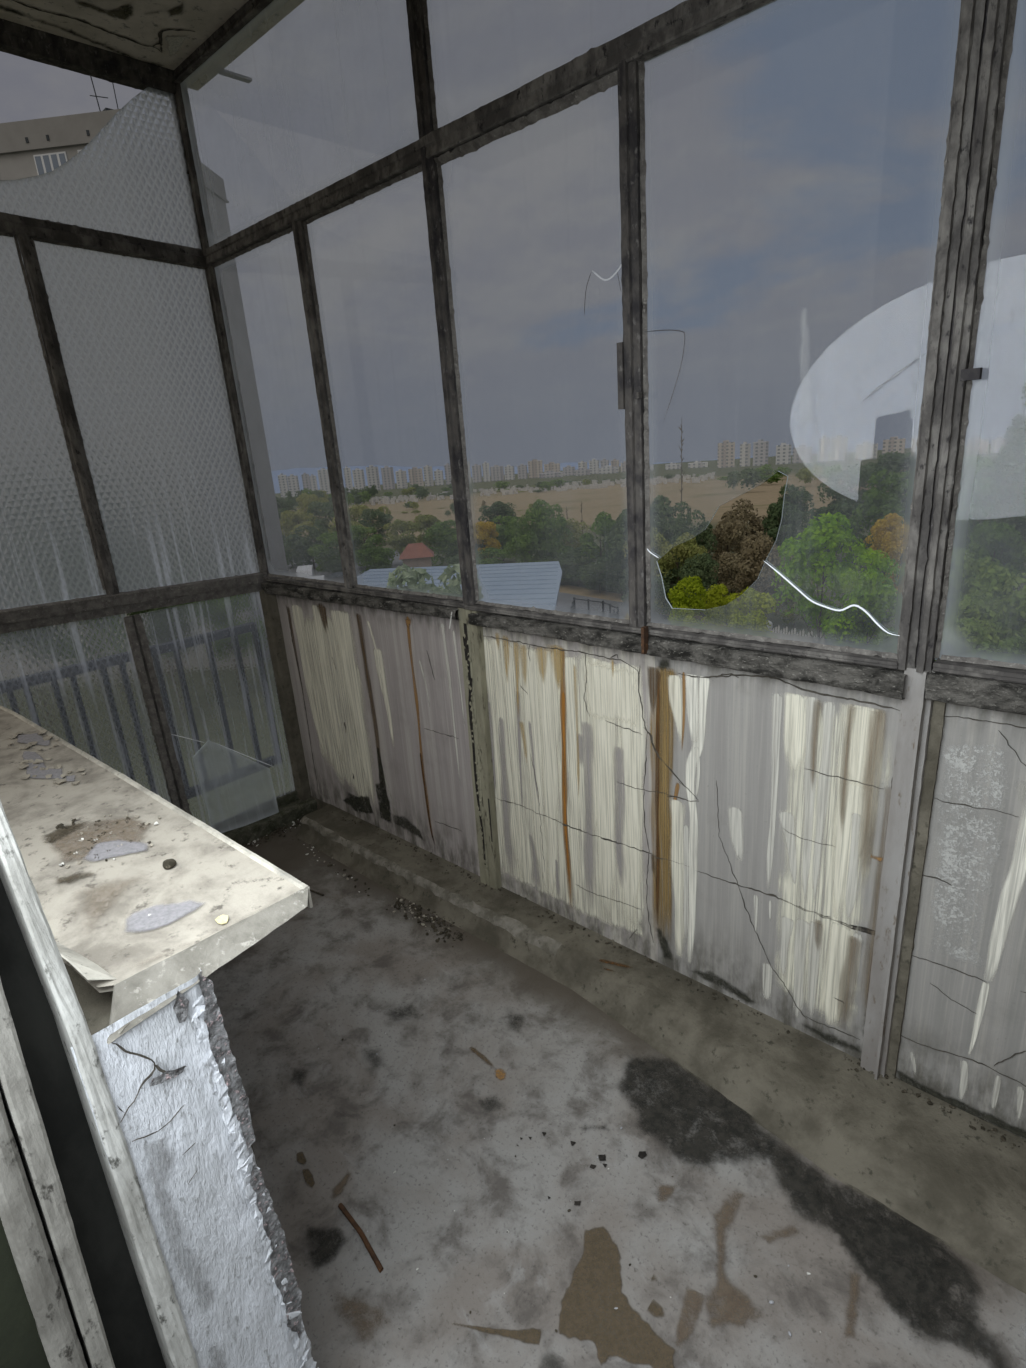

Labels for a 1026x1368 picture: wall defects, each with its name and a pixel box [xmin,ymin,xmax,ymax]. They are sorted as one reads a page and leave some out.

peeling [463,623,493,873]
rust [497,638,579,901]
rust [648,661,685,959]
crack [486,636,900,1040]
crack [936,798,1017,817]
crack [944,716,1026,766]
spalling [150,1065,186,1087]
spalling [173,974,319,1368]
water stain [620,1058,1003,1368]
crack [912,955,986,1014]
water stain [896,1070,1026,1138]